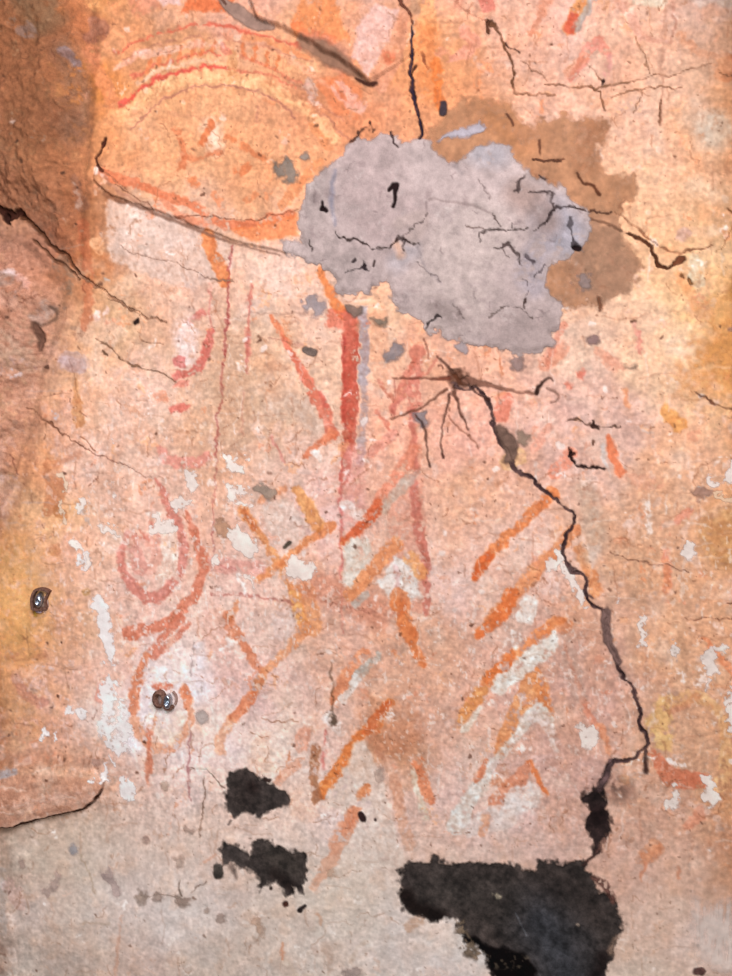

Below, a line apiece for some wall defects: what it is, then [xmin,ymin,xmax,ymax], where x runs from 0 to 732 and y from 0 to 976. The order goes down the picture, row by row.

crack [465,10,689,124]
peeling [440,123,486,140]
crack [0,206,161,321]
damp [427,99,641,311]
crack [466,159,710,319]
crack [95,338,176,382]
crack [390,357,650,764]
damp [225,768,290,824]
damp [213,839,308,913]
damp [396,759,626,976]